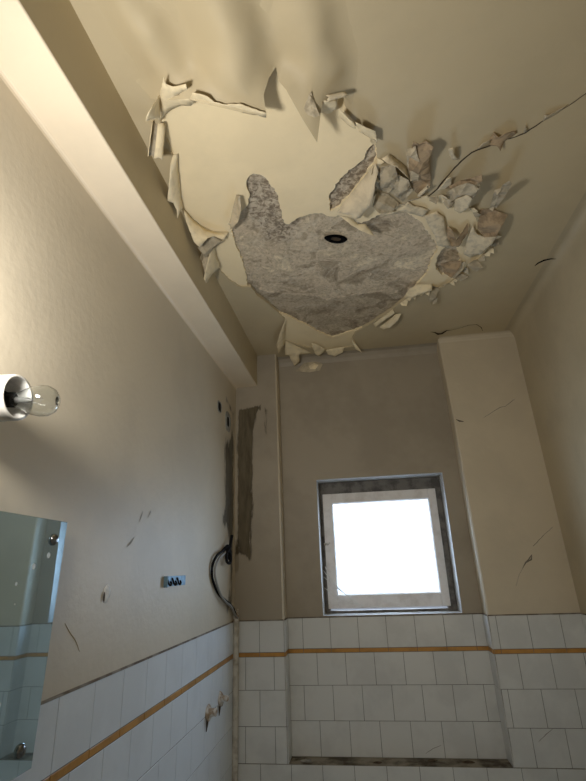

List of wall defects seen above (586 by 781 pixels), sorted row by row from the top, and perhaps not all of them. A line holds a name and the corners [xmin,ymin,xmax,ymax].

peeling [161,68,512,373]
crack [420,94,585,198]